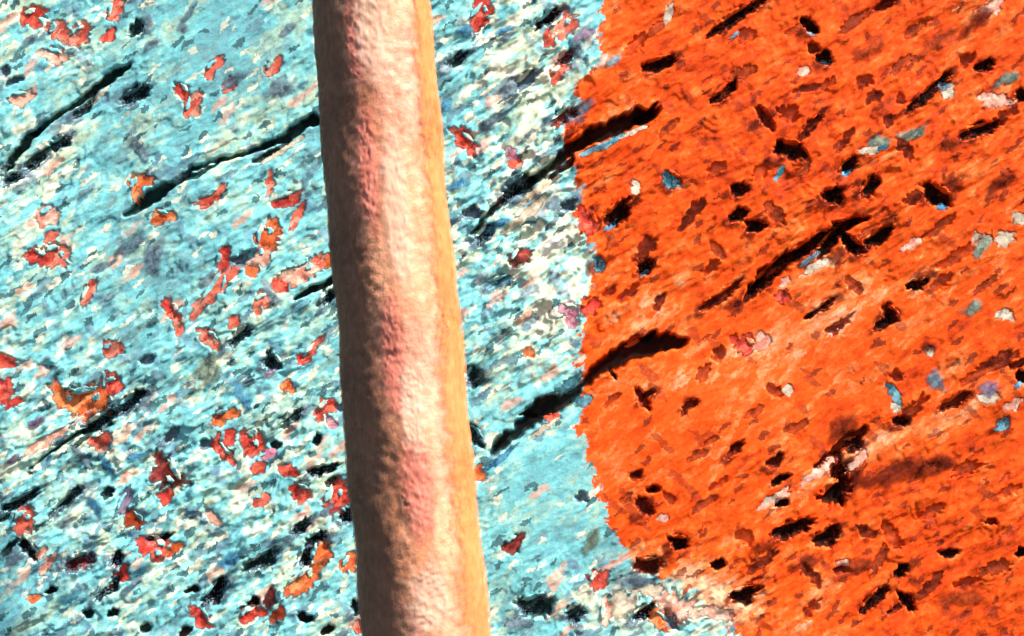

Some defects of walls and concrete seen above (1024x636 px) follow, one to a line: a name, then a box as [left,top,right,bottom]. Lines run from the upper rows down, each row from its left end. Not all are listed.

crack [5,65,131,172]
peeling [126,173,154,205]
crack [124,114,319,216]
crack [470,102,659,234]
crack [744,217,868,302]
crack [0,391,144,522]
peeling [24,339,154,457]
crack [491,330,687,455]